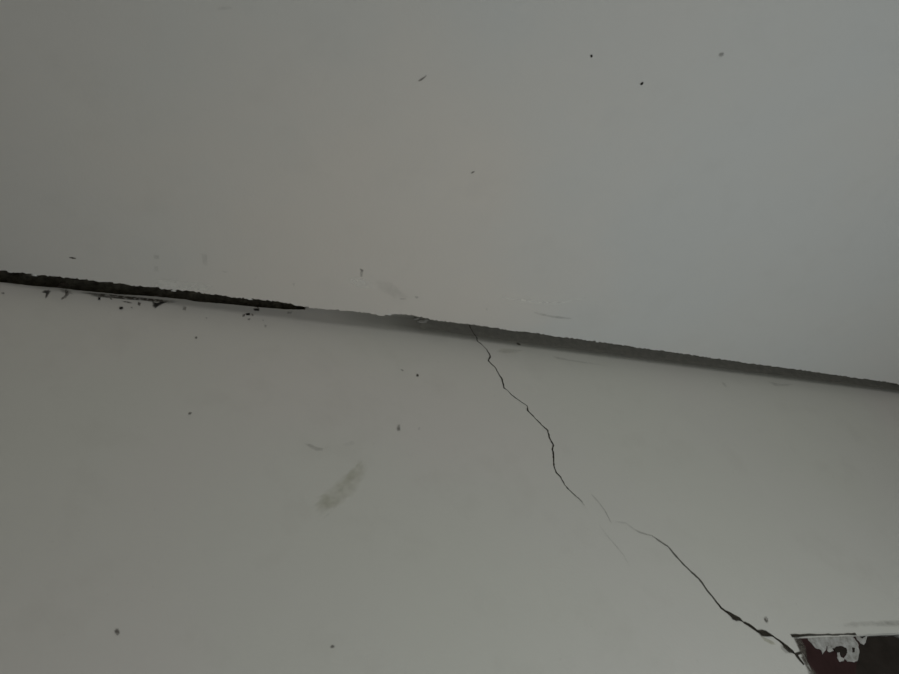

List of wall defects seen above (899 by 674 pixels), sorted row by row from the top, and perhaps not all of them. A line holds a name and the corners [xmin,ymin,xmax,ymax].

crack [469,324,580,500]
crack [668,546,804,665]
peeling [791,633,867,674]